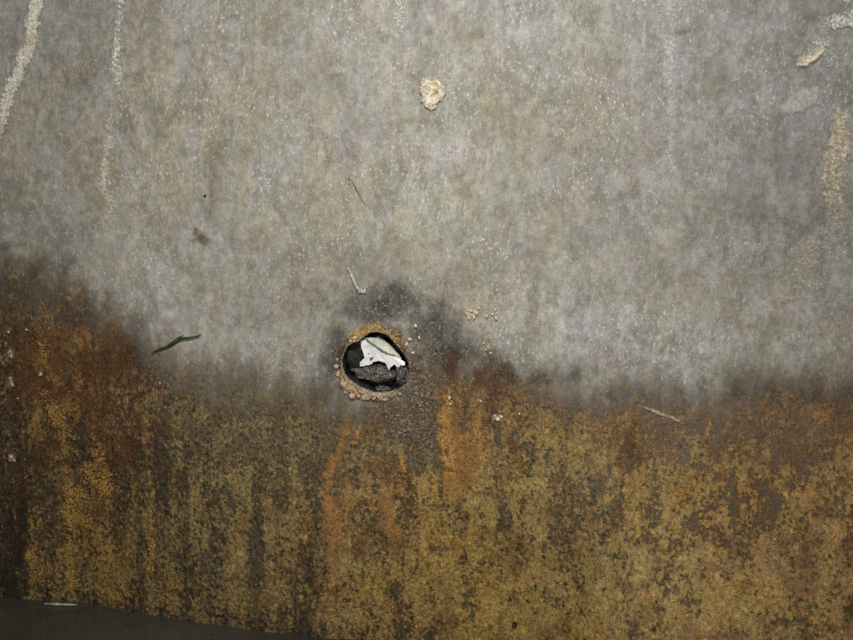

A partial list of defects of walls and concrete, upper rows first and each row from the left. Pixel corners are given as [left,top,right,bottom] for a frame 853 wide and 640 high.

damp [0,0,43,138]
spalling [419,78,446,111]
damp [813,0,853,62]
damp [822,107,850,205]
rust [318,413,362,558]
spalling [332,322,440,467]
damp [0,267,853,640]
rust [436,352,489,503]